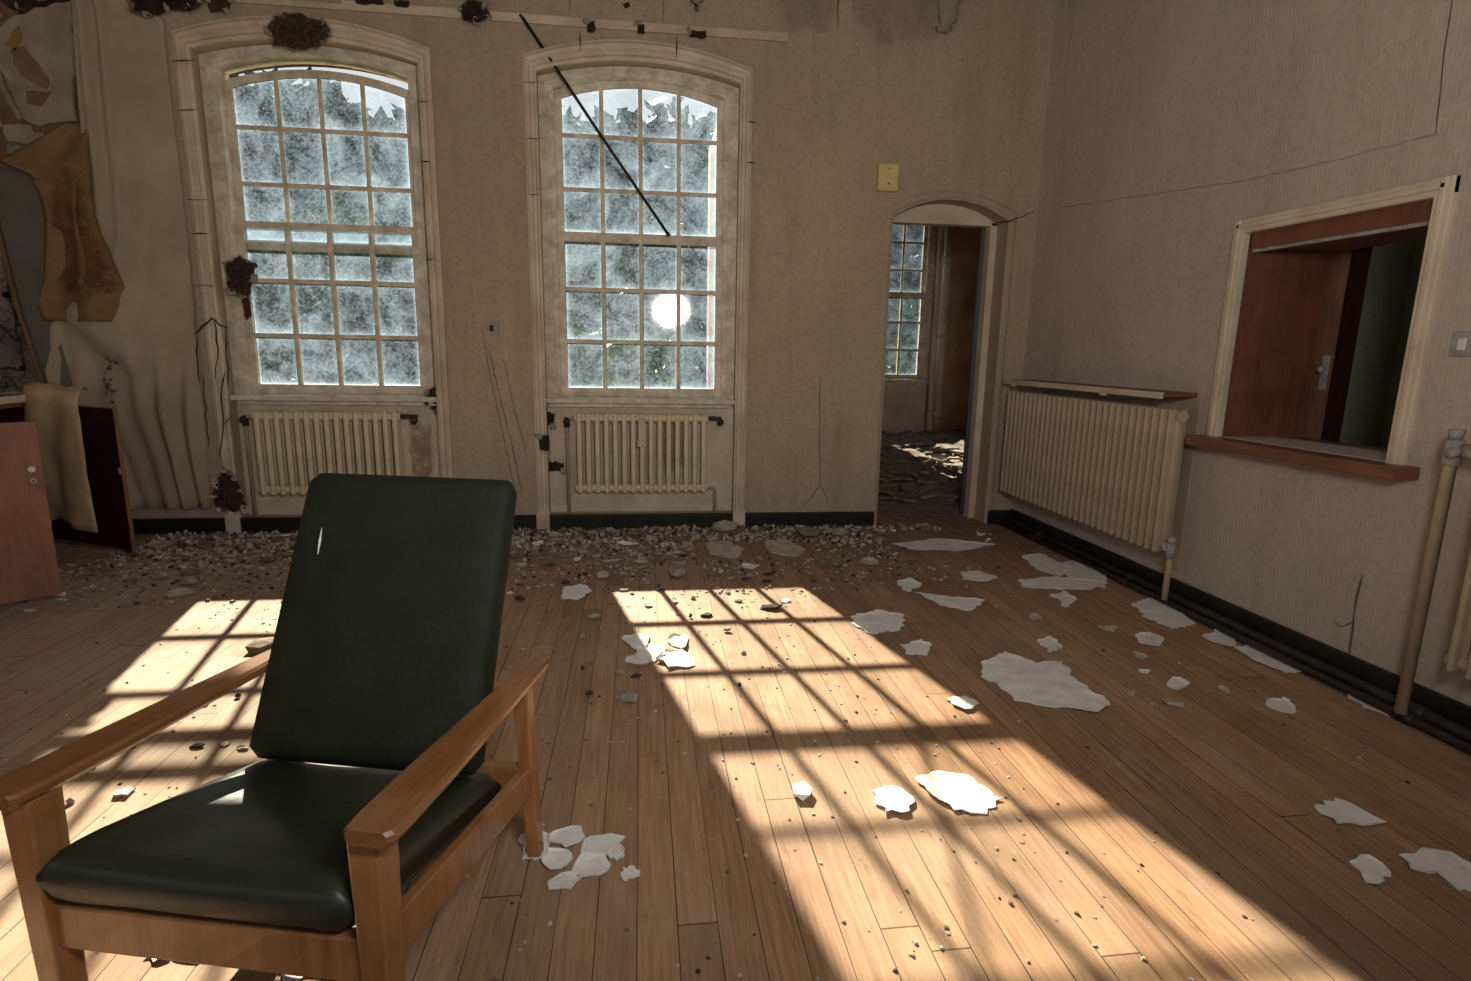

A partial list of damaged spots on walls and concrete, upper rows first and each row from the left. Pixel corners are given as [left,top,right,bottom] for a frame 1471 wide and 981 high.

spalling [129,0,235,18]
spalling [263,12,331,52]
spalling [458,0,492,26]
spalling [583,18,596,32]
spalling [623,2,645,34]
spalling [687,0,706,39]
crack [0,257,40,392]